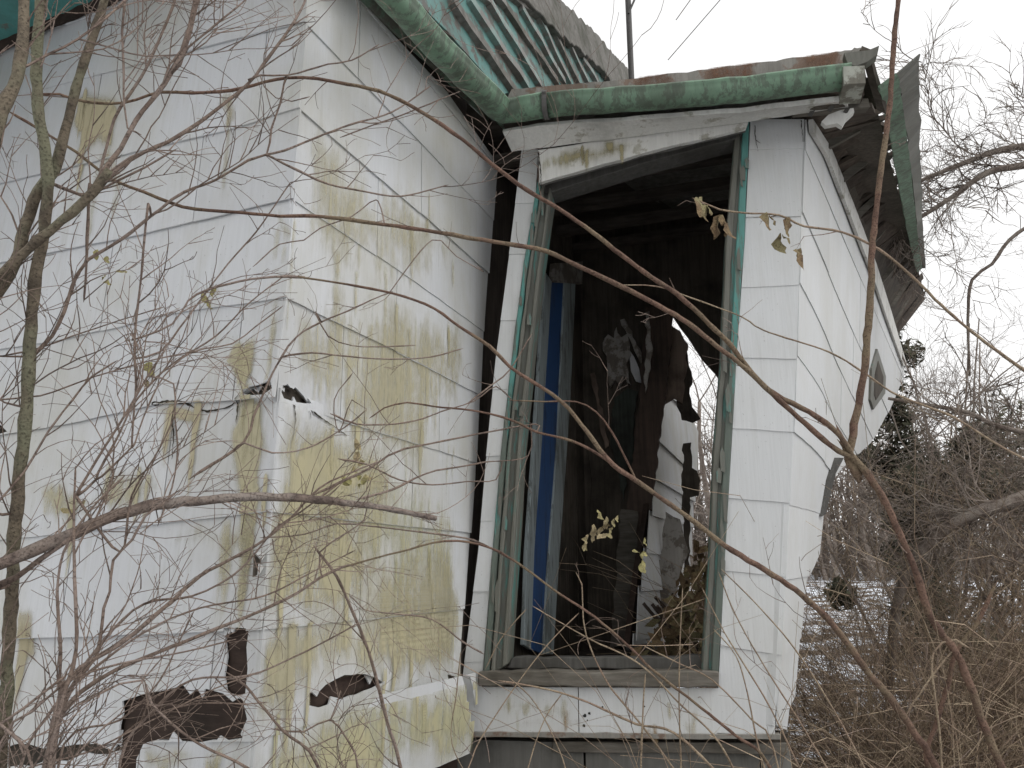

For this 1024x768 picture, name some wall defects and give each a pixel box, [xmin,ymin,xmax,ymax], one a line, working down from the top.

rust [711,63,752,78]
rust [807,52,837,66]
leakage [237,342,260,453]
spalling [244,384,303,403]
leakage [221,474,274,608]
leakage [273,502,313,768]